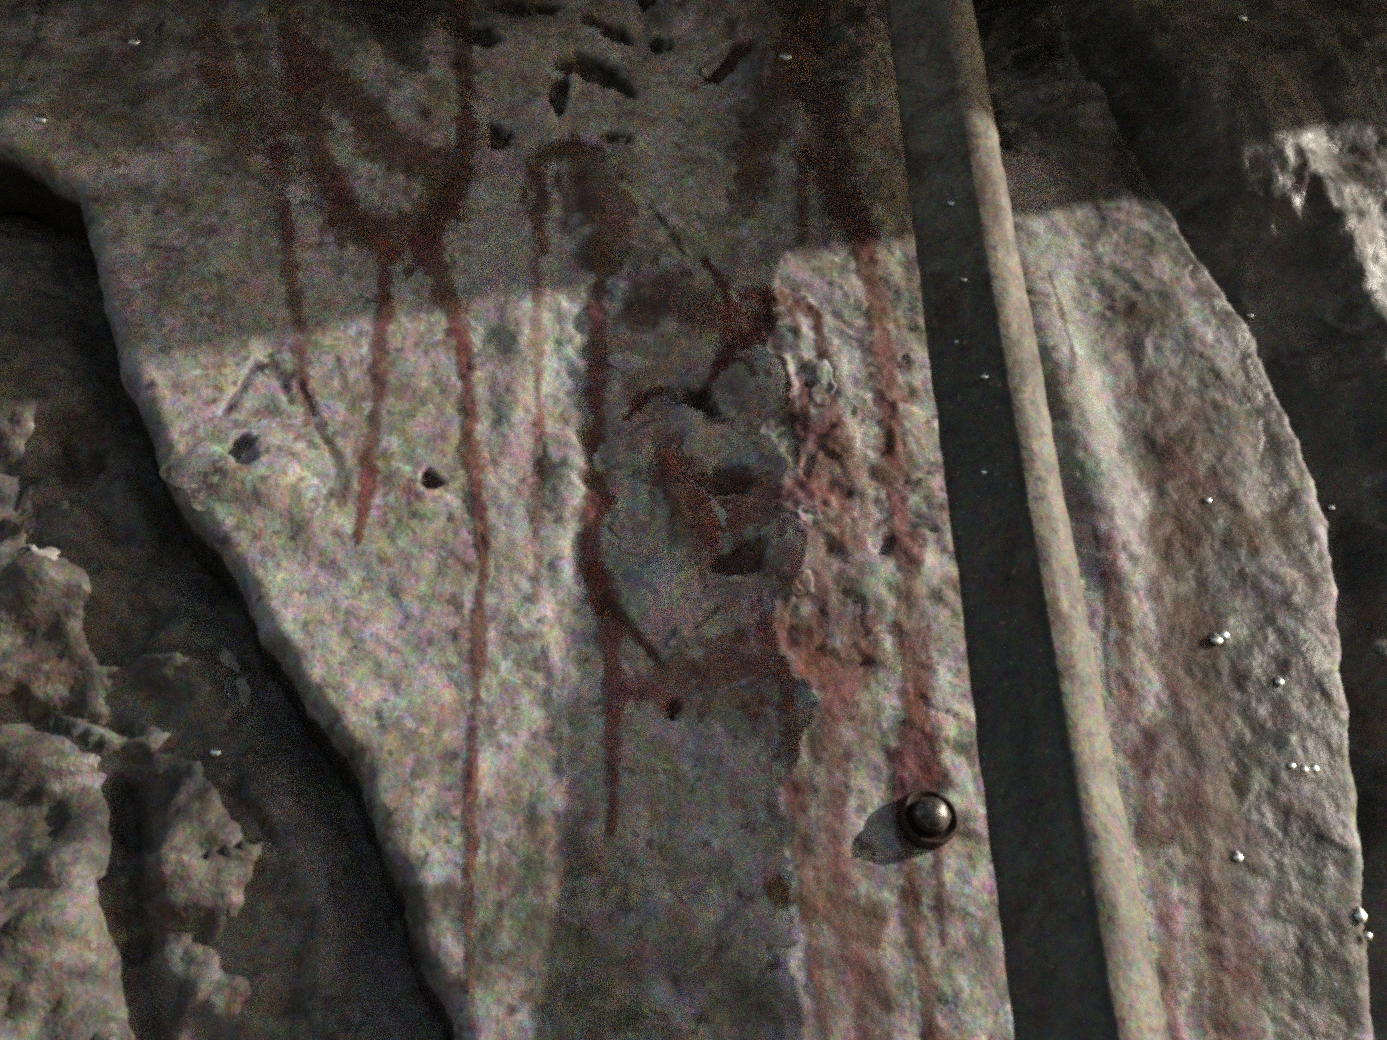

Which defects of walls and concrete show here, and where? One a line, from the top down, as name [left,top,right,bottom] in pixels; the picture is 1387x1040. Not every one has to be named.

rust [268,0,491,1029]
rust [518,0,958,1040]